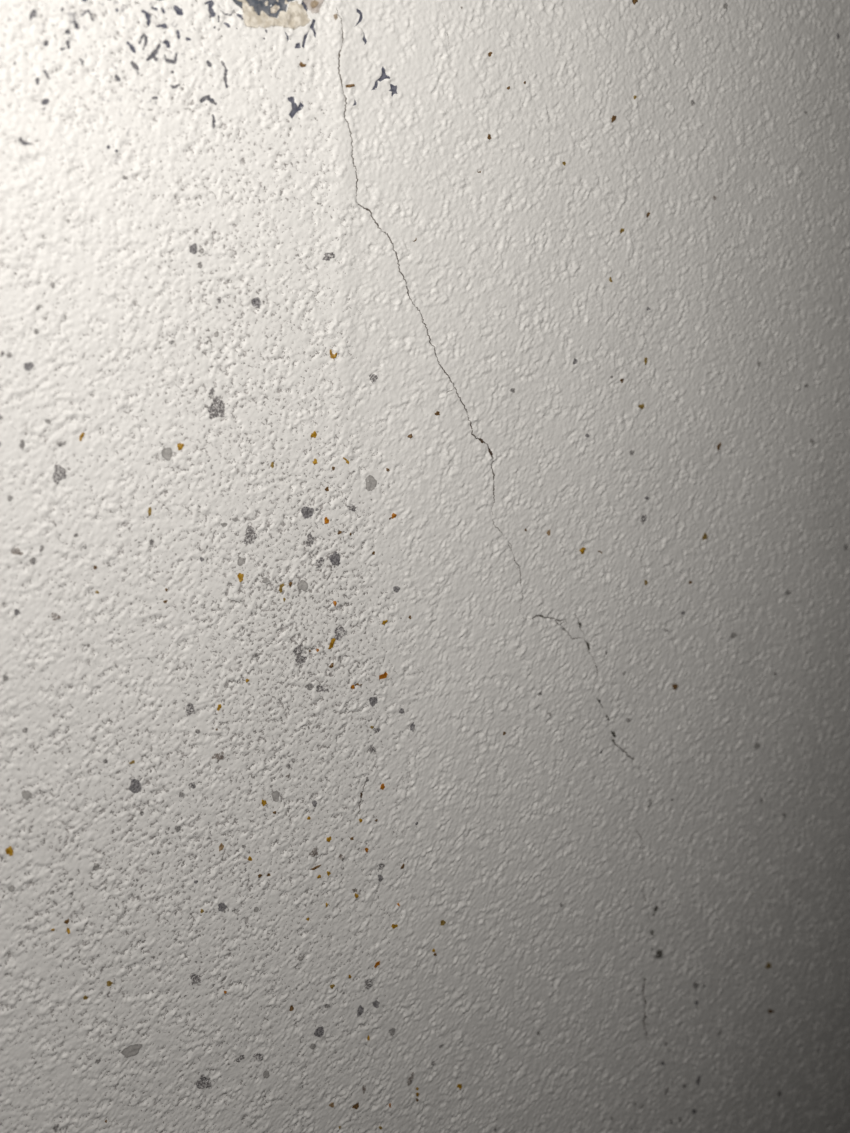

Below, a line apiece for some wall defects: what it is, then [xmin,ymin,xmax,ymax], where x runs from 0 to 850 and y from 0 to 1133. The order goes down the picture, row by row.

peeling [44,0,94,51]
peeling [126,0,191,89]
peeling [205,0,324,48]
peeling [206,60,228,88]
peeling [200,95,217,129]
crack [336,8,501,532]
crack [533,615,598,673]
crack [598,700,633,759]